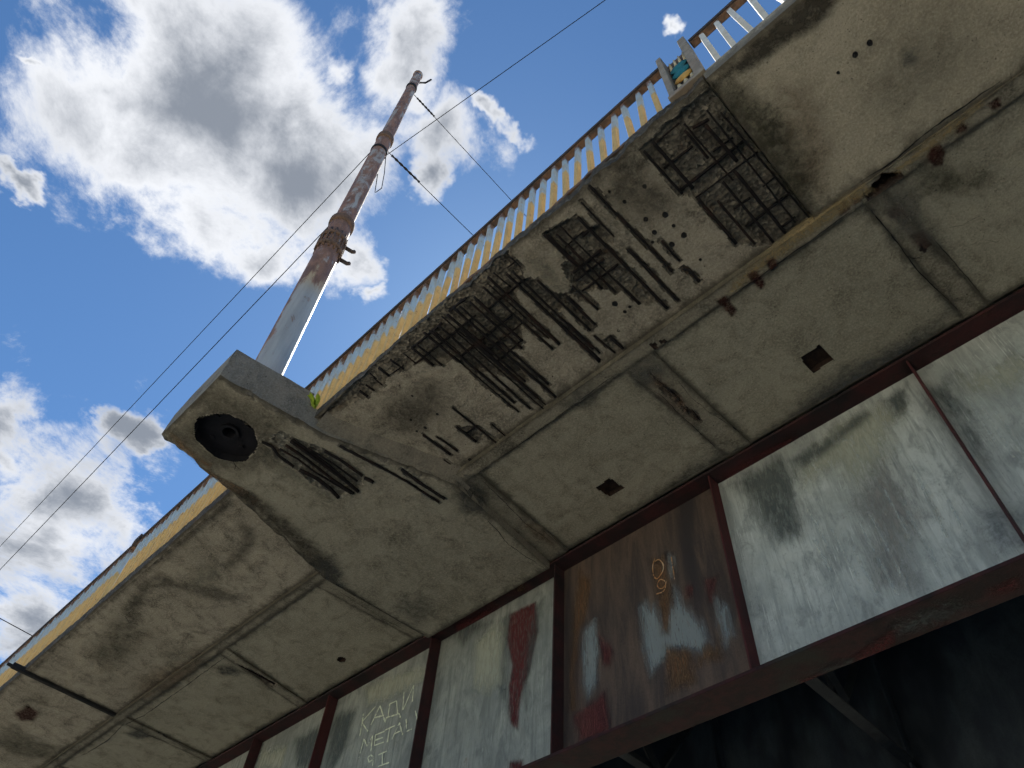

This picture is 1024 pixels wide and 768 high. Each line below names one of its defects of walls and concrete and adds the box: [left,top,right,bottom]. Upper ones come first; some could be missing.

spalling [637,87,810,248]
hole [862,170,904,201]
corrosion [928,145,945,166]
corrosion [748,258,777,289]
spalling [317,184,704,423]
corrosion [716,296,736,316]
spalling [410,419,472,465]
spalling [450,405,507,444]
spalling [260,430,448,505]